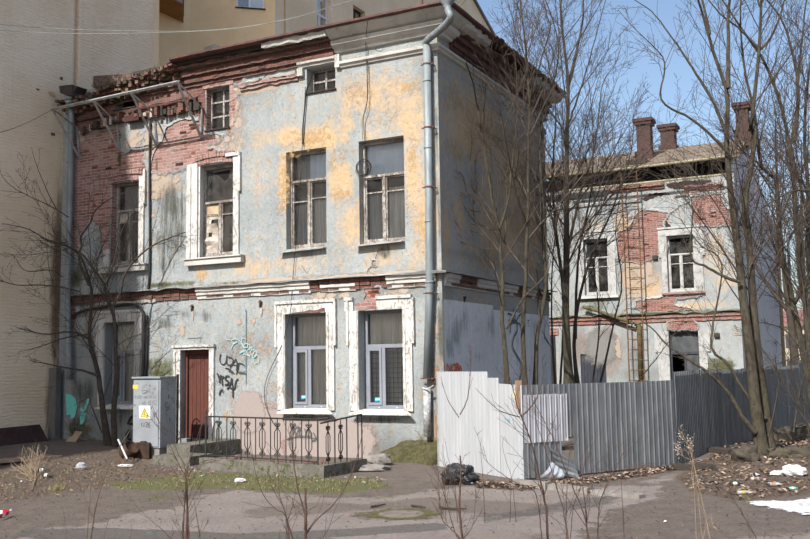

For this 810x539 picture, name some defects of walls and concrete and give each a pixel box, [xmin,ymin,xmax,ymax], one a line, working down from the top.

flaking render [72,77,248,259]
damp [165,190,182,214]
flaking render [613,179,731,287]
peeling [371,259,417,274]
flaking render [292,284,409,314]
flaking render [633,293,703,332]